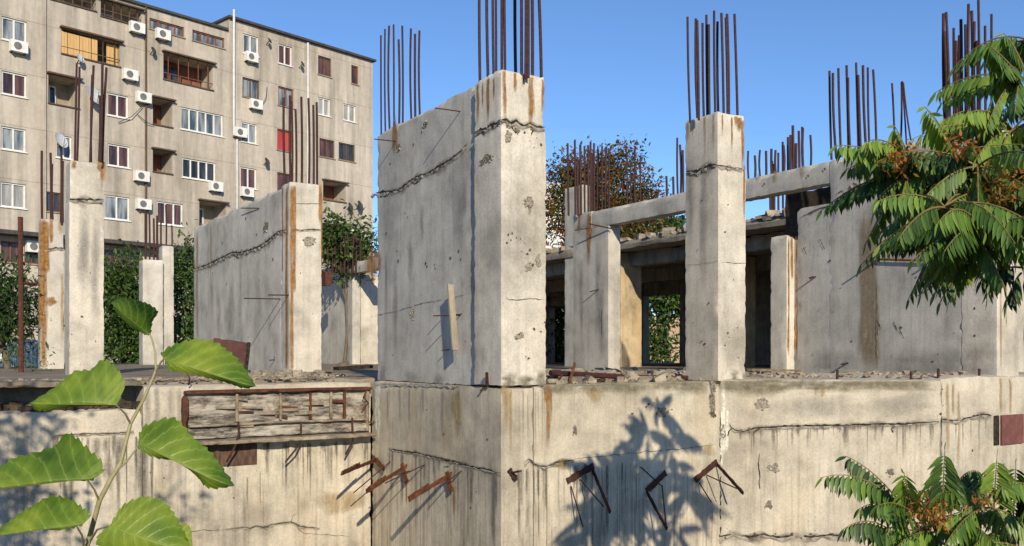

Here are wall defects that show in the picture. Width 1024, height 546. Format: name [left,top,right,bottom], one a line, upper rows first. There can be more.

rust [477,71,545,120]
crack [371,118,545,198]
crack [685,163,742,176]
rust [687,114,759,213]
rust [39,219,63,364]
rust [282,187,296,368]
crack [371,387,992,546]